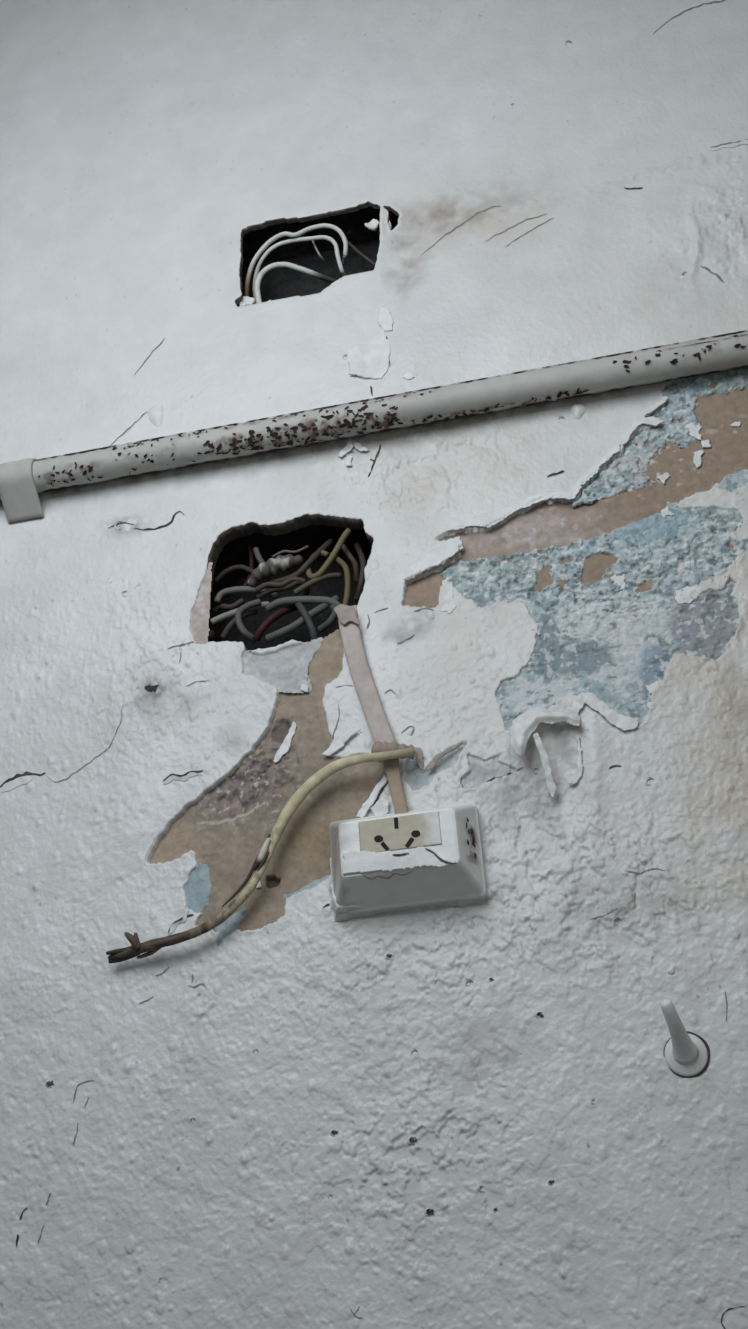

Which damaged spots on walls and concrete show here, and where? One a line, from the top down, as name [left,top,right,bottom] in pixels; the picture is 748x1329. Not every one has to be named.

crack [653,0,724,34]
corrosion [38,462,103,487]
corrosion [112,388,588,474]
peeling [338,438,369,466]
crack [109,511,184,530]
flaking render [190,562,213,644]
peeling [403,367,748,798]
crack [0,707,123,792]
peeling [150,629,389,946]